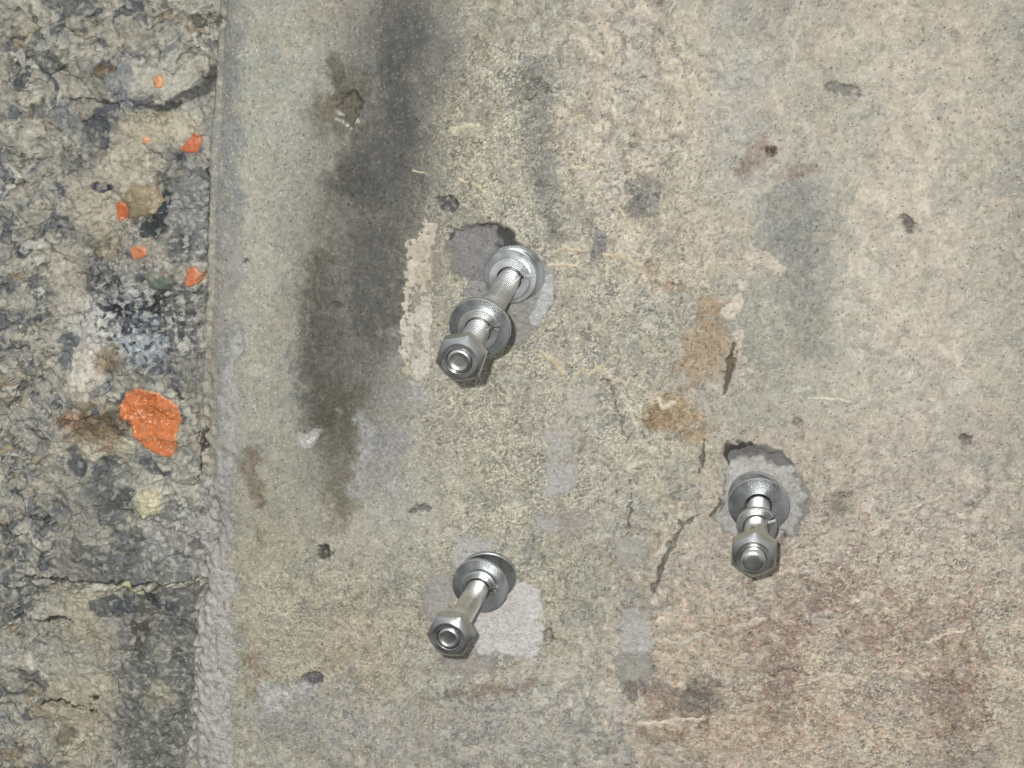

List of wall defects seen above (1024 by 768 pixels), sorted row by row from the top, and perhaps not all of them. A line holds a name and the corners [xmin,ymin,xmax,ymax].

leakage [297,105,412,516]
crack [698,438,706,473]
crack [650,498,721,593]